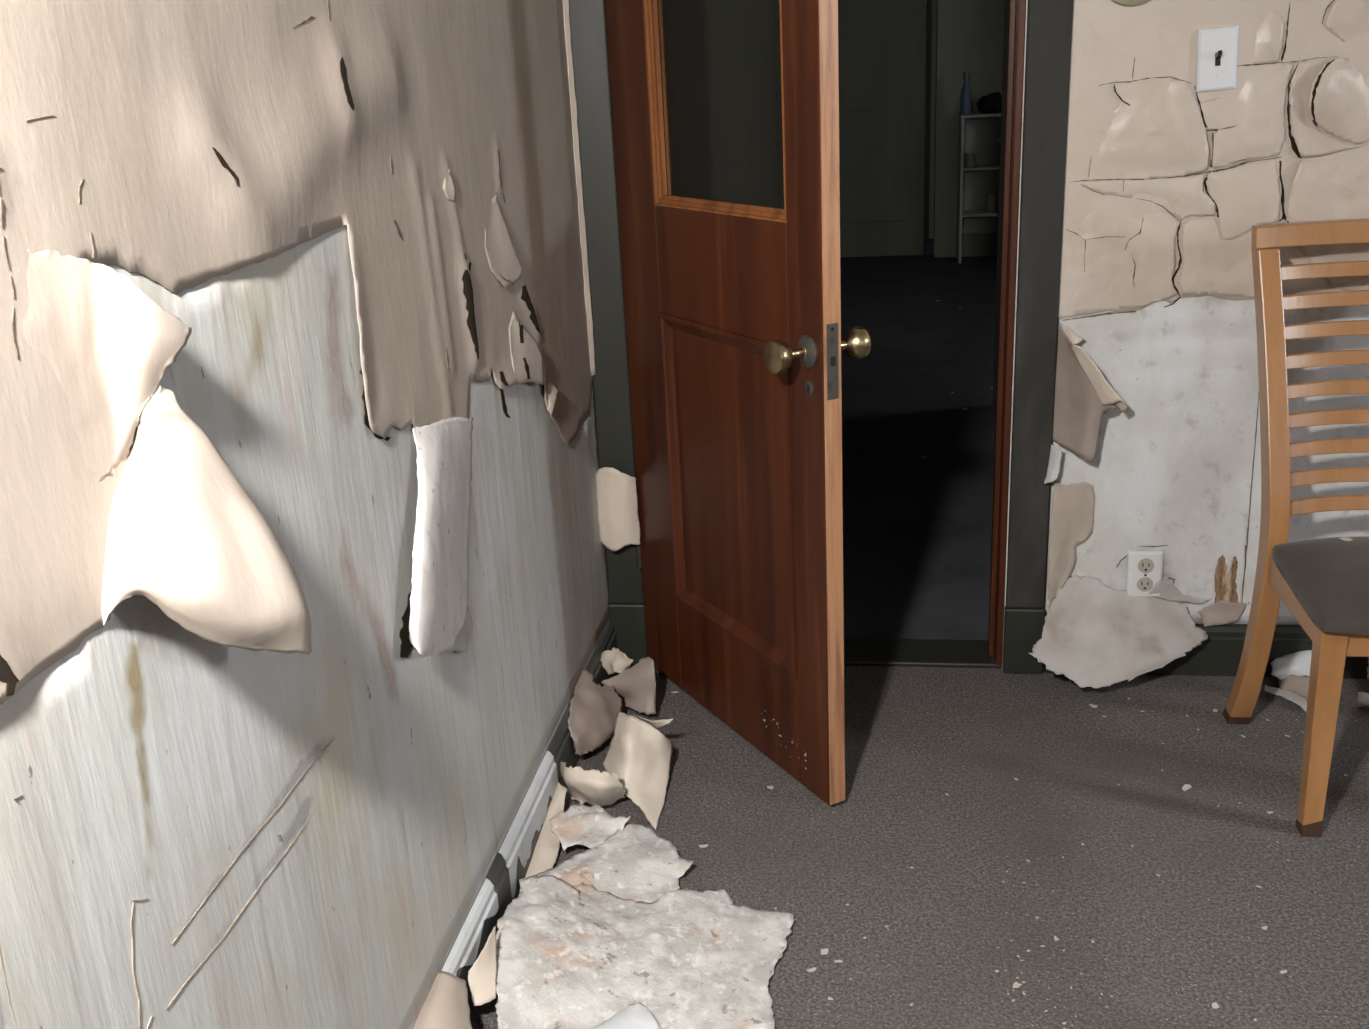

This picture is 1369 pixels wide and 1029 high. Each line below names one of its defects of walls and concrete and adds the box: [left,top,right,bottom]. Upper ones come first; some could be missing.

crack [293,0,331,28]
crack [340,57,354,110]
crack [213,147,240,187]
crack [1062,6,1337,321]
crack [78,179,96,258]
crack [0,168,19,359]
peeling [1044,296,1261,624]
peeling [1284,305,1369,543]
peeling [0,225,610,1029]
peeling [1276,600,1300,625]
crack [0,655,19,705]